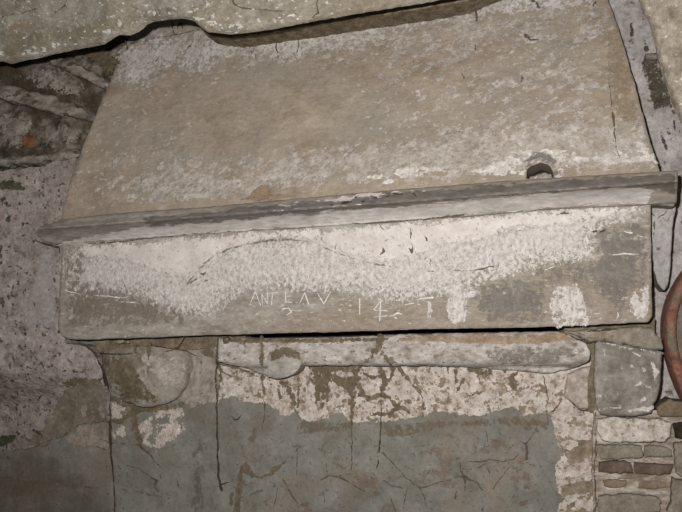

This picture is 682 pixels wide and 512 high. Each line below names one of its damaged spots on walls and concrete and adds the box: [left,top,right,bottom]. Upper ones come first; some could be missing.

crack [165,20,200,48]
mould [642,61,676,150]
crack [84,344,161,512]
crack [215,335,241,491]
crack [321,420,365,501]
peeling [134,347,593,512]
crack [376,376,597,512]